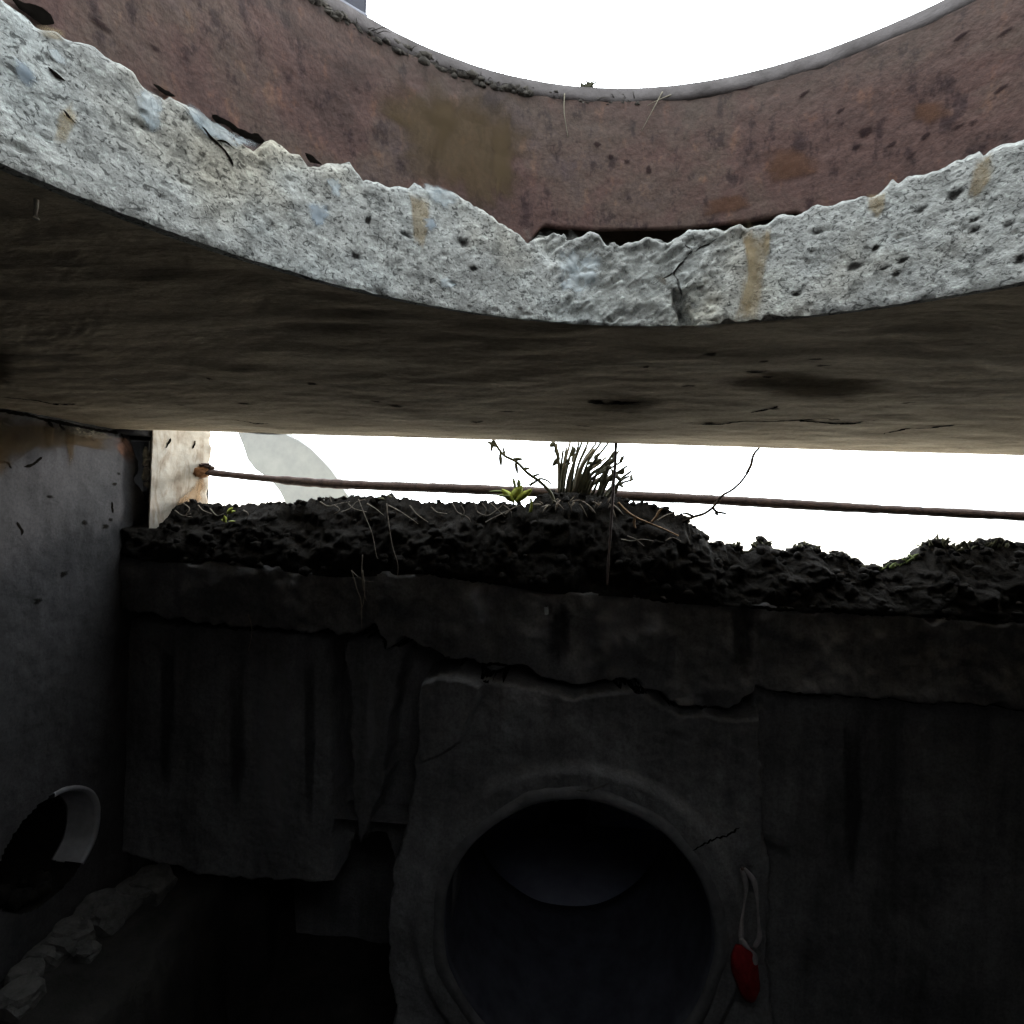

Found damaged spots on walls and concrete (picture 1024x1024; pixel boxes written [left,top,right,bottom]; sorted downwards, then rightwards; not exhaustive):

peeling [49,49,65,64]
peeling [137,90,162,130]
peeling [188,108,248,144]
peeling [328,180,340,196]
peeling [425,184,456,206]
peeling [550,234,600,298]
crack [653,239,716,301]
crack [702,406,963,434]
crack [693,827,740,851]